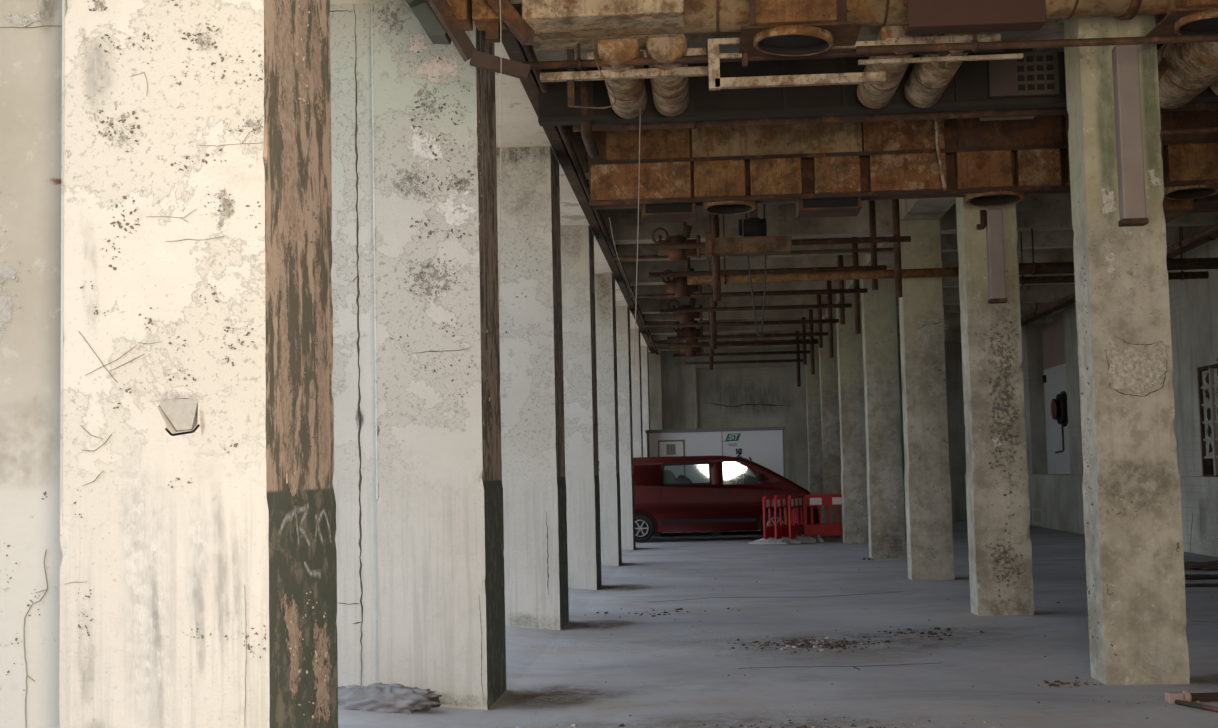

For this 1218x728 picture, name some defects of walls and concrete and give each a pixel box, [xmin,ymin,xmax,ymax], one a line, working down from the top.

peeling [91,108,140,152]
peeling [100,196,140,270]
spalling [156,369,199,436]
crack [23,550,73,728]